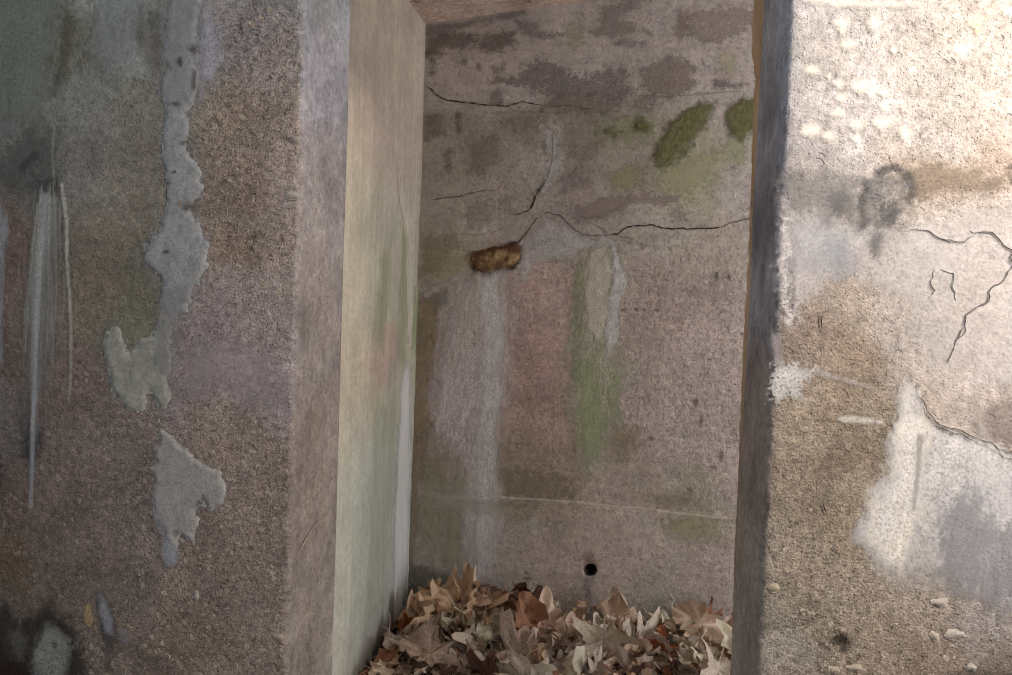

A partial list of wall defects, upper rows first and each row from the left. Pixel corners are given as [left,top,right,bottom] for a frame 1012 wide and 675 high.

crack [427,86,593,109]
water stain [0,135,72,473]
peeling [97,0,211,413]
water stain [378,166,732,622]
crack [462,133,750,242]
water stain [750,330,860,402]
water stain [838,416,882,424]
water stain [753,165,1012,380]
crack [910,229,1012,361]
peeling [150,429,227,565]
water stain [853,379,1012,611]